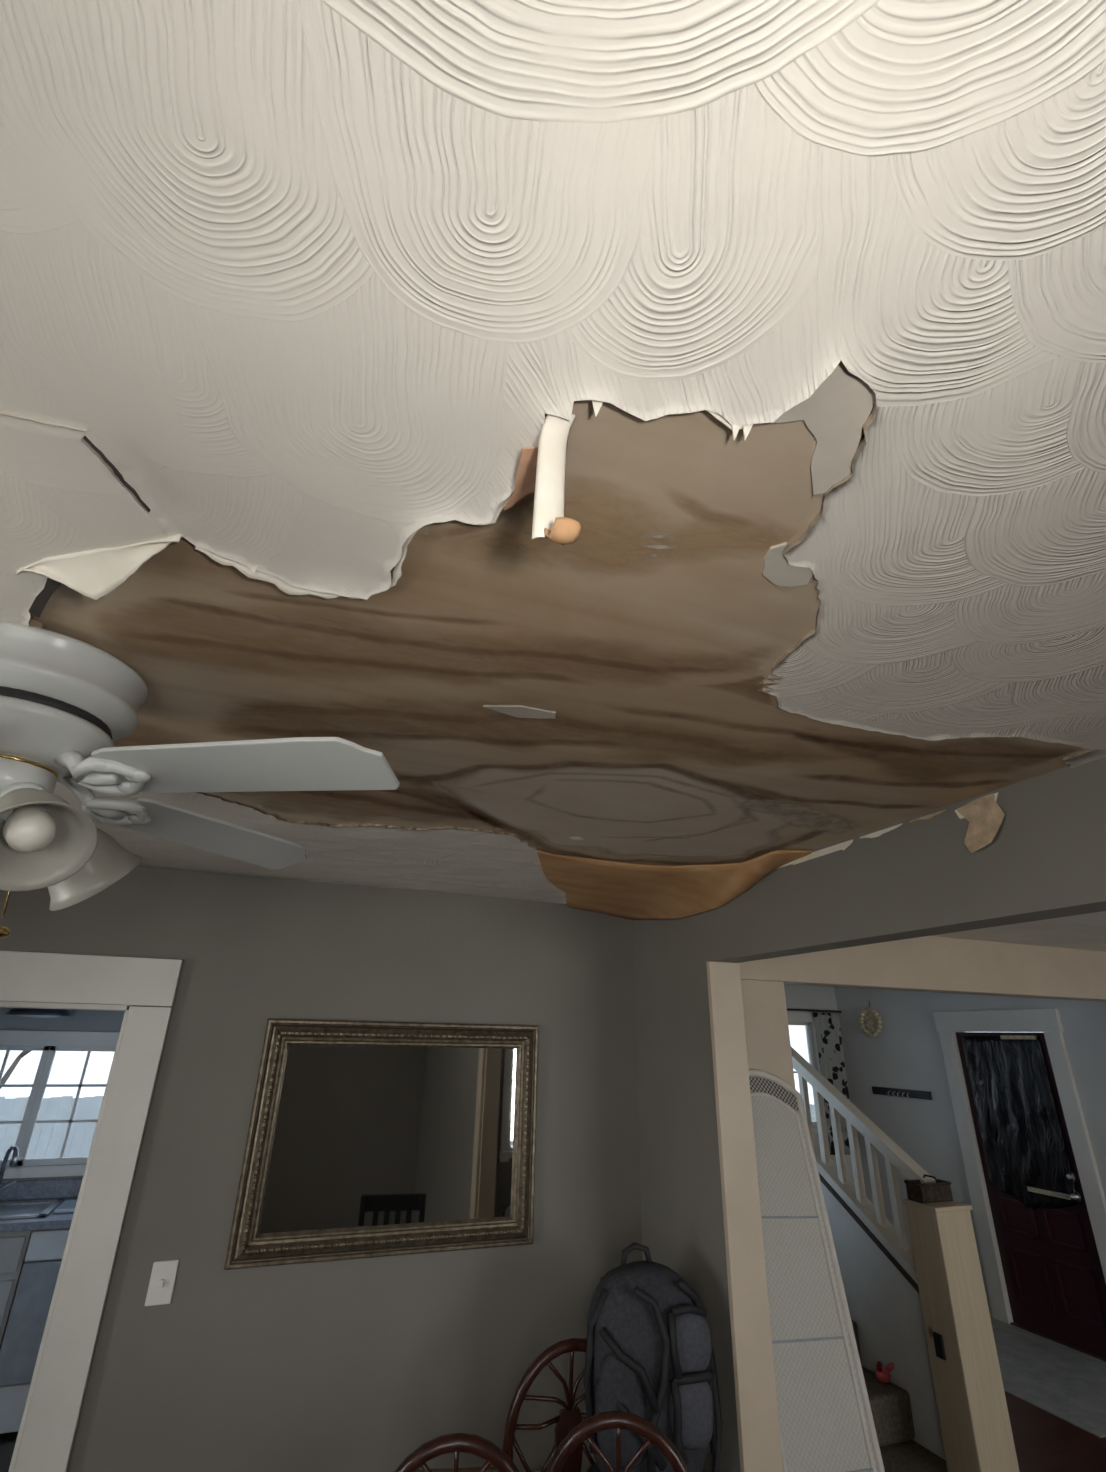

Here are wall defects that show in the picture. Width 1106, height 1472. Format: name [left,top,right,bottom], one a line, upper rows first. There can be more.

crack [0,411,150,512]
peeling [592,400,603,417]
peeling [732,424,753,441]
peeling [483,705,556,719]
water stain [330,762,852,865]
peeling [954,792,1005,853]